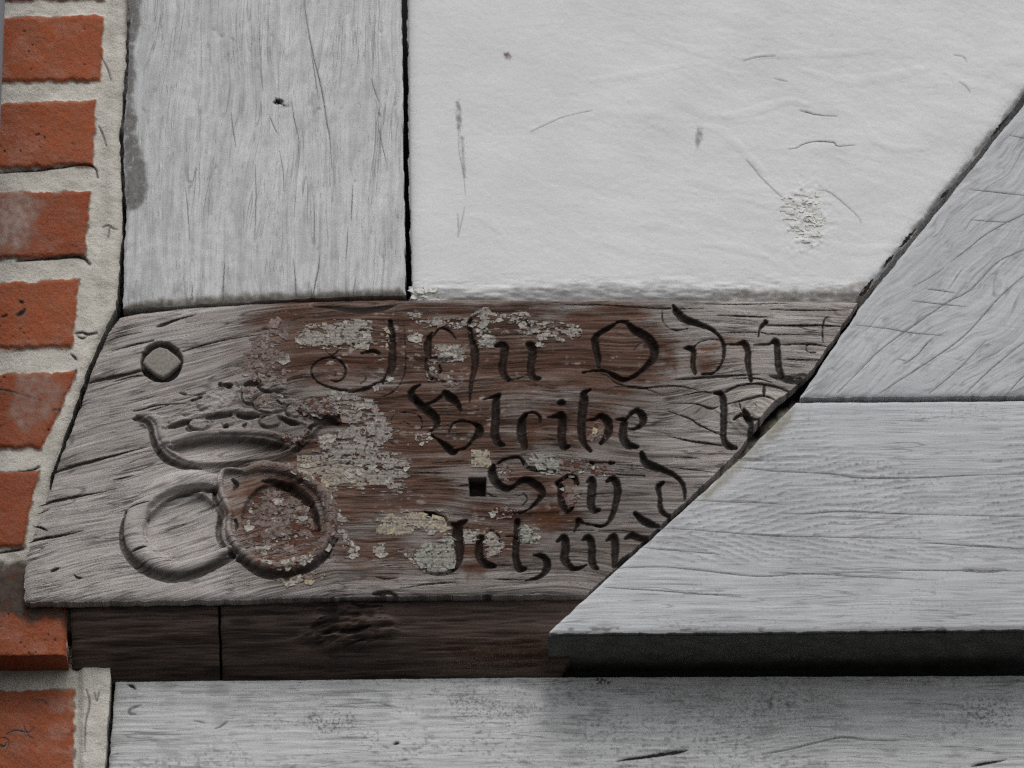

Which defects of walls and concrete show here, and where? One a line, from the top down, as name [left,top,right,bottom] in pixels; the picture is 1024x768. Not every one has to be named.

spalling [780,188,826,245]
peeling [407,284,582,387]
peeling [235,316,433,588]
peeling [471,450,615,507]
peeling [373,503,541,576]